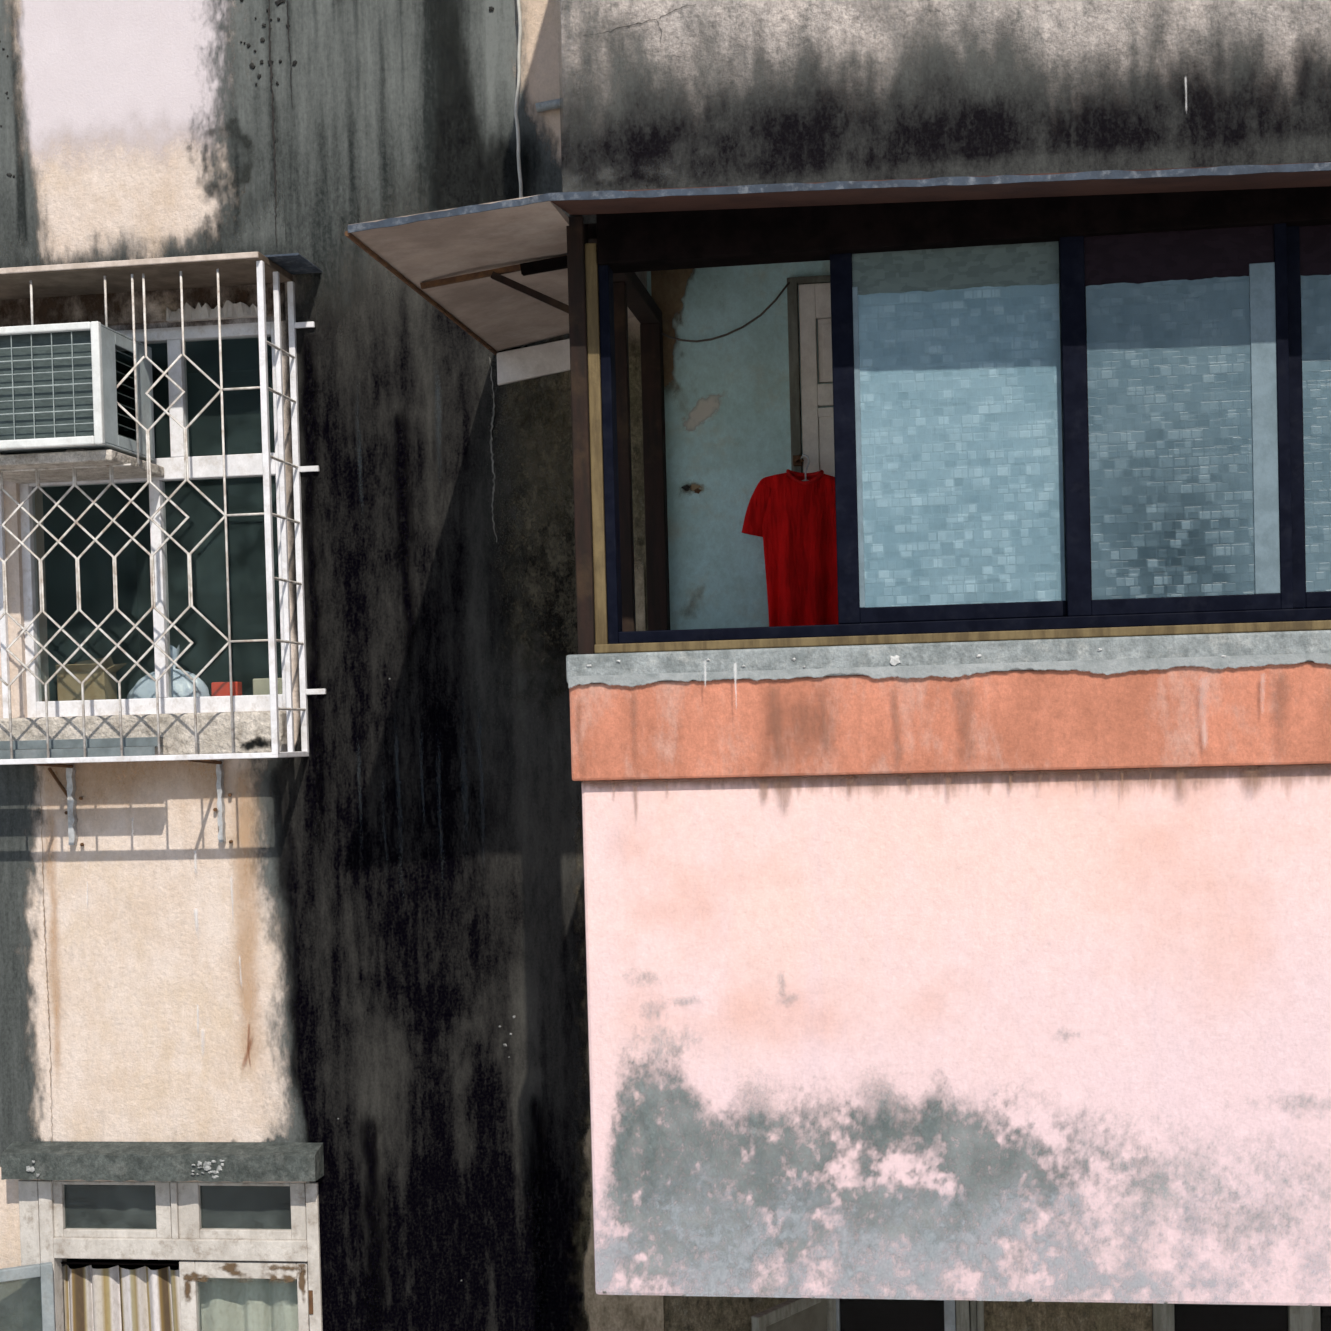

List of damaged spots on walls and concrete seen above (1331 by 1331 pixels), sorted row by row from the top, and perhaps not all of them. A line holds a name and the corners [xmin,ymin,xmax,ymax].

crack [583,5,692,42]
leakage [0,0,145,268]
leakage [432,0,1331,210]
leakage [161,197,286,258]
leakage [0,285,258,331]
leakage [265,283,274,322]
leakage [280,283,302,752]
leakage [0,764,51,1167]
leakage [595,1062,1171,1303]
peeling [184,1272,207,1298]
peeling [222,1263,250,1278]
peeling [269,1264,306,1300]